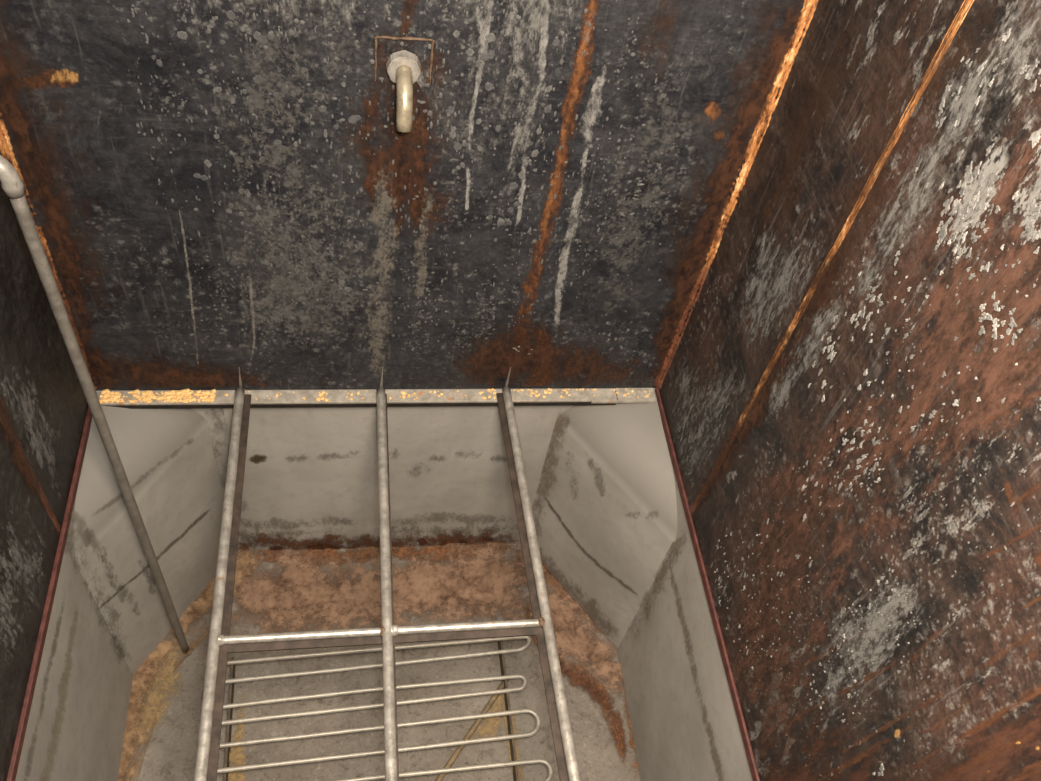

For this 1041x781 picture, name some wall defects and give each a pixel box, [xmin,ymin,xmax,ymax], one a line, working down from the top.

rust [12,69,78,89]
rust [354,56,446,238]
water stain [468,0,494,149]
water stain [516,14,548,224]
rust [456,0,638,386]
water stain [555,188,582,324]
water stain [582,72,605,174]
rust [650,5,801,377]
rust [92,353,267,388]
rust [733,133,1041,781]
rust [239,530,514,551]